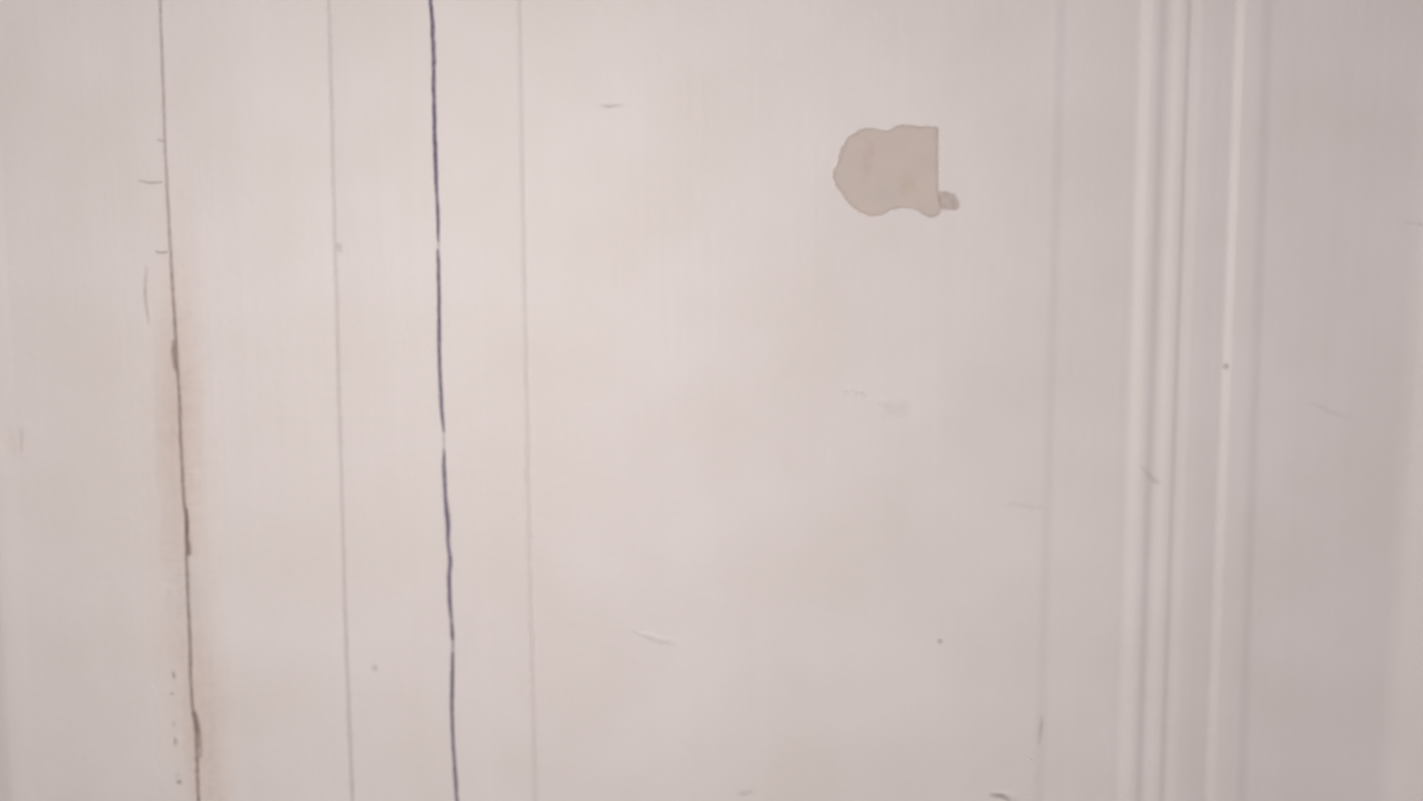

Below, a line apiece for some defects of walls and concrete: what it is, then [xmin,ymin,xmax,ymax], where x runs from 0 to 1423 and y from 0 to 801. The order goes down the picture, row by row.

crack [430,0,443,421]
peeling [834,126,940,217]
crack [443,458,457,801]